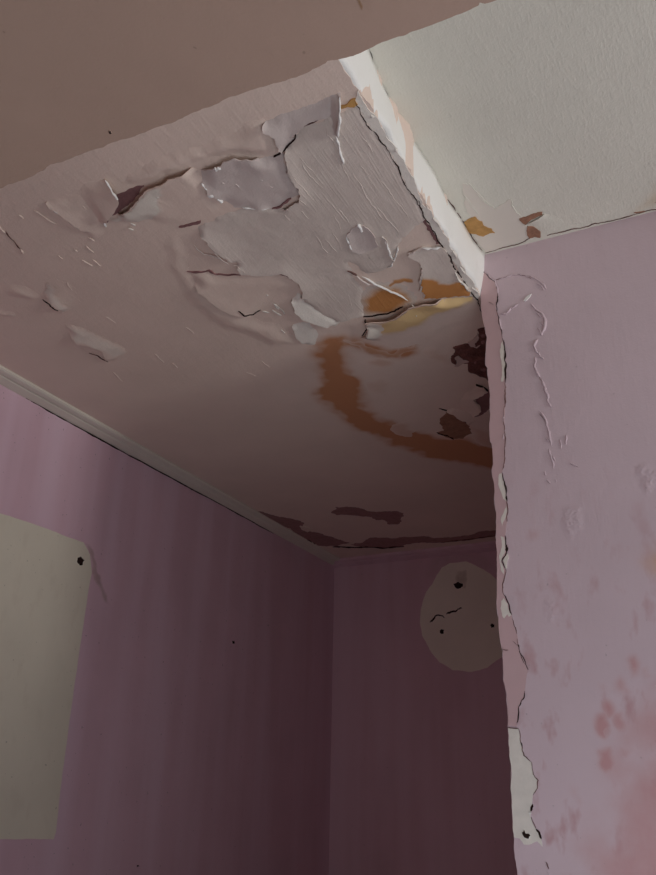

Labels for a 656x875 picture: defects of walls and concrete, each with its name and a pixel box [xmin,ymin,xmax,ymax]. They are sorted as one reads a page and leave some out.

peeling [35,91,480,345]
peeling [463,183,564,253]
peeling [65,324,128,362]
water stain [299,297,493,473]
flaking render [437,327,490,440]
crack [347,105,656,727]
peeling [496,274,567,484]
peeling [258,473,509,574]
spalling [500,598,511,618]
flaking render [508,727,543,847]